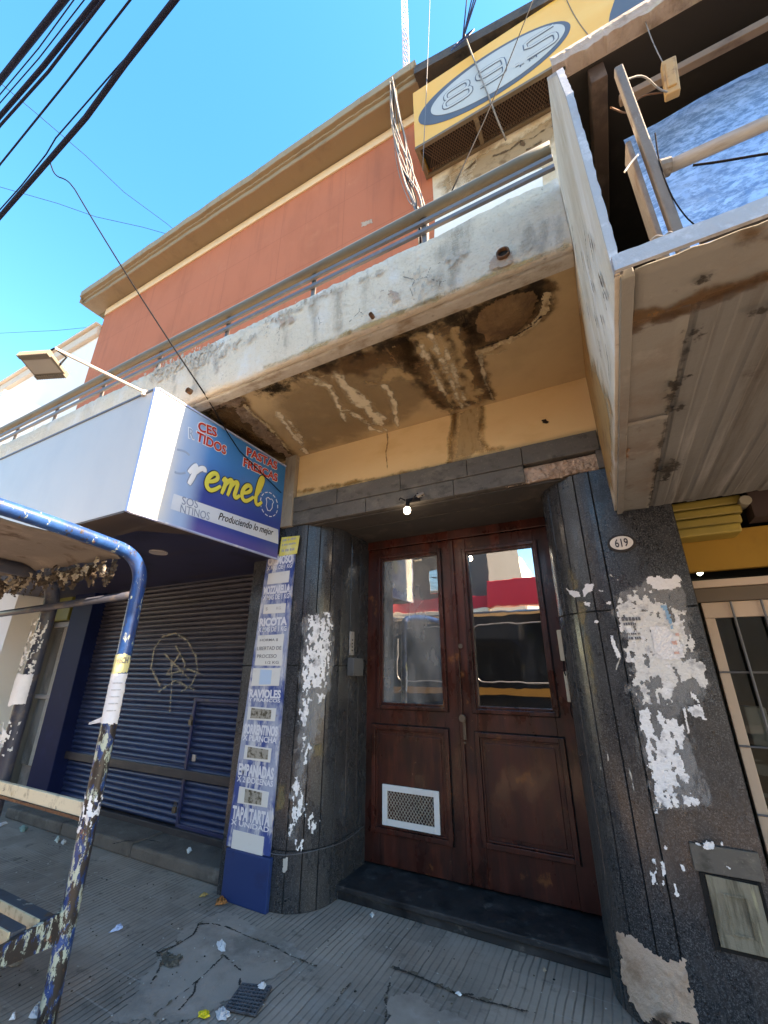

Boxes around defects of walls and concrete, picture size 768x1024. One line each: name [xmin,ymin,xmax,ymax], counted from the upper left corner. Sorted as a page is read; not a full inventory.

leakage [203,400,309,460]
leakage [255,279,556,463]
leakage [648,328,707,506]